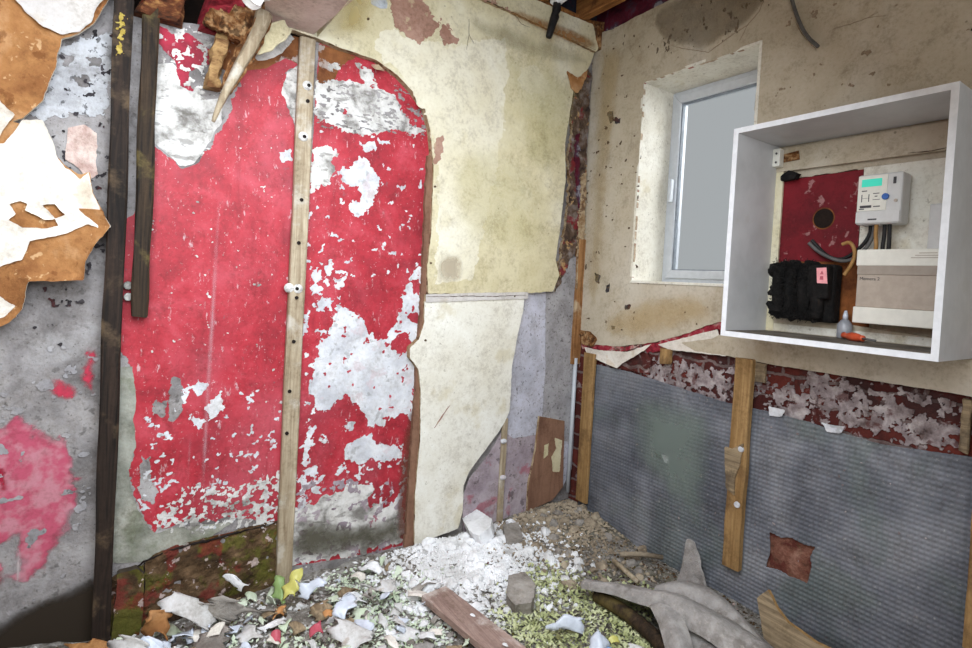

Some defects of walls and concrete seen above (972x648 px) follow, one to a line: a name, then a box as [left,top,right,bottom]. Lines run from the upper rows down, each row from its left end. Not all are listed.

peeling [371,0,459,46]
peeling [30,32,112,121]
peeling [155,26,222,166]
peeling [271,147,293,163]
peeling [281,67,297,123]
peeling [310,62,444,217]
peeling [292,210,421,568]
spalling [110,367,282,636]
spalling [766,533,815,583]